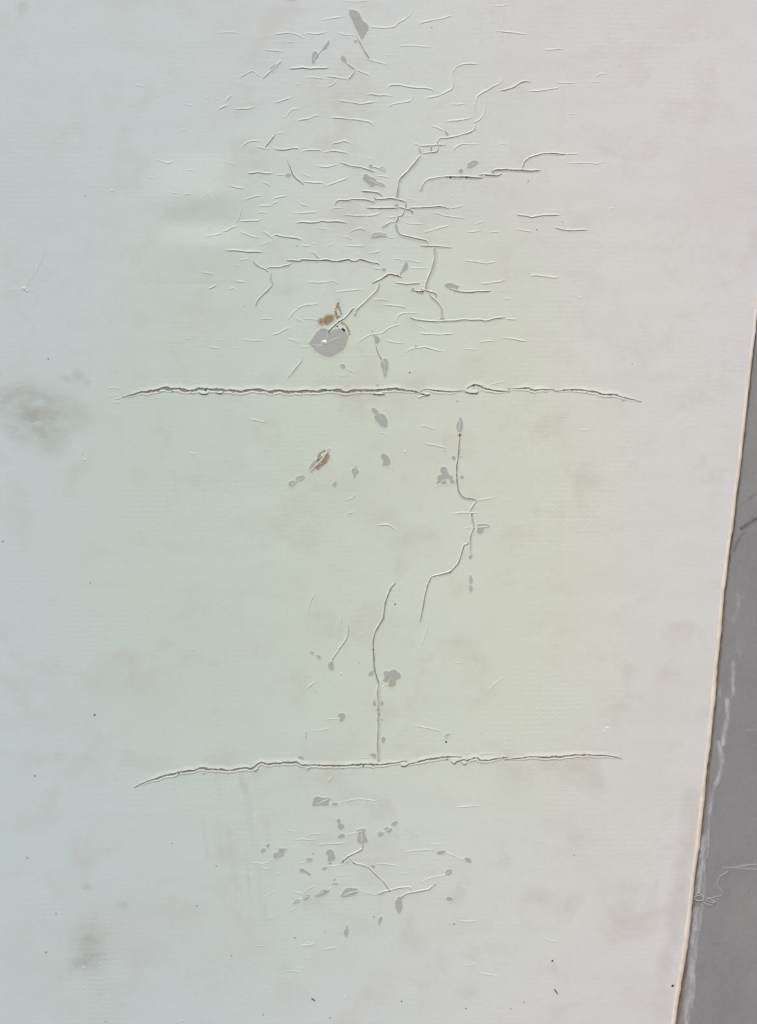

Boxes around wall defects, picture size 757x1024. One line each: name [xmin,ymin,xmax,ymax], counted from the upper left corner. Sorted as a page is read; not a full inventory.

peeling [343,7,371,44]
crack [105,0,642,423]
peeling [307,326,356,373]
crack [418,424,497,629]
crack [134,583,622,788]
peeling [367,667,403,722]
peeling [292,795,399,905]
peeling [372,849,473,926]